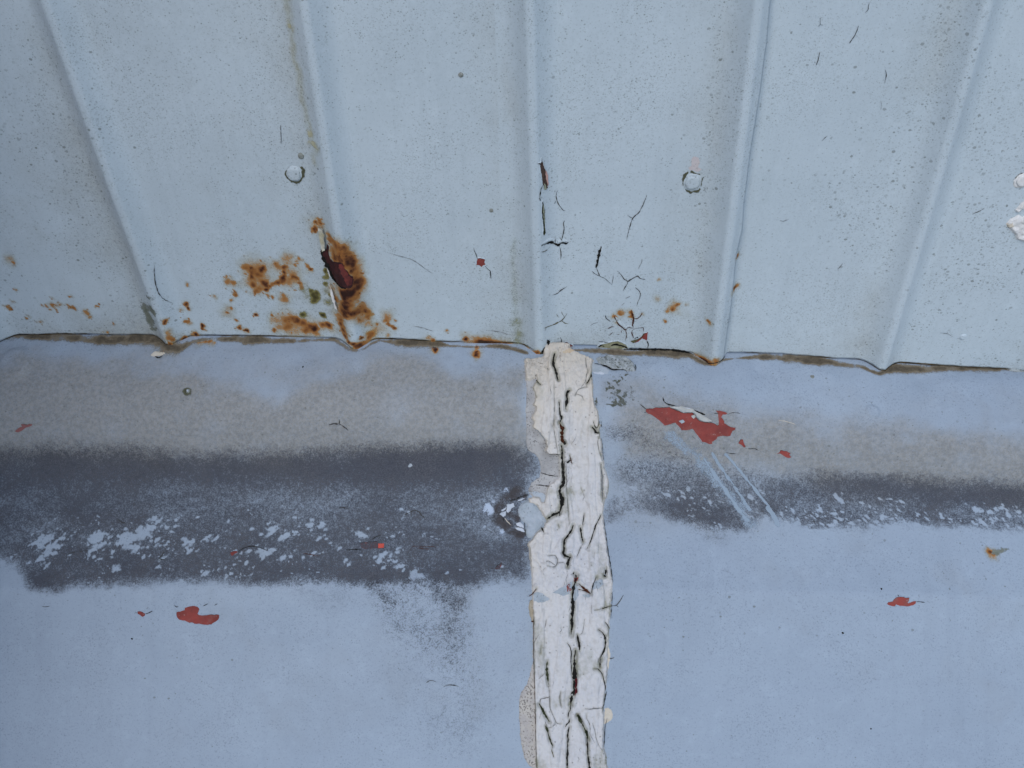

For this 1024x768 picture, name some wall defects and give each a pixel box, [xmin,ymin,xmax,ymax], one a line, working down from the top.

crack [541,193,569,259]
rust [214,217,397,349]
crack [592,246,645,340]
peeling [640,398,757,454]
leakage [622,452,1024,531]
leakage [0,441,539,631]
crack [529,353,623,768]
peeling [175,604,220,625]
peeling [886,595,925,607]